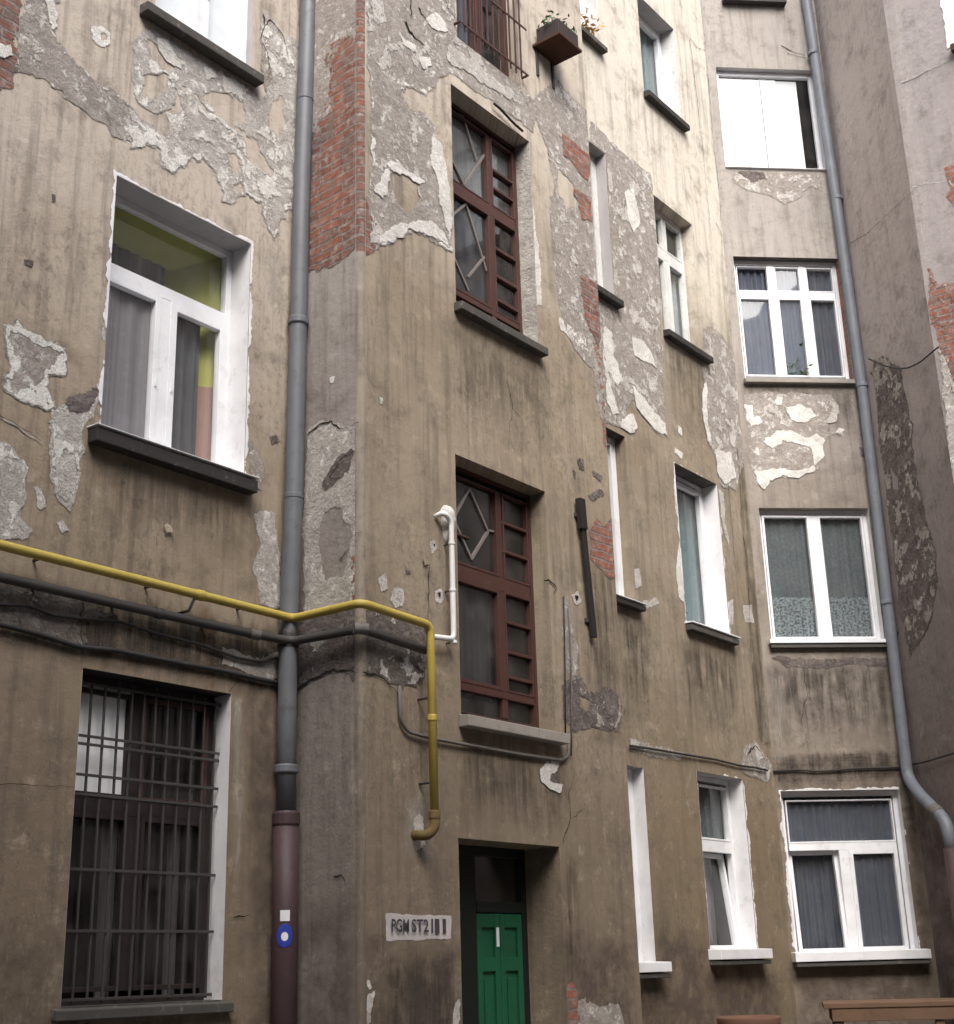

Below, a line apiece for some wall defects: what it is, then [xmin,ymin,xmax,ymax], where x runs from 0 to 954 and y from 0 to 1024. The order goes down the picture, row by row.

flaking render [0,0,299,240]
flaking render [308,0,667,447]
flaking render [732,171,823,204]
flaking render [0,317,99,540]
flaking render [252,510,282,609]
flaking render [297,420,427,690]
flaking render [589,518,615,579]
flaking render [701,326,844,544]
flaking render [873,356,938,657]
flaking render [561,591,684,761]
flaking render [741,739,773,783]
leakage [786,672,847,712]